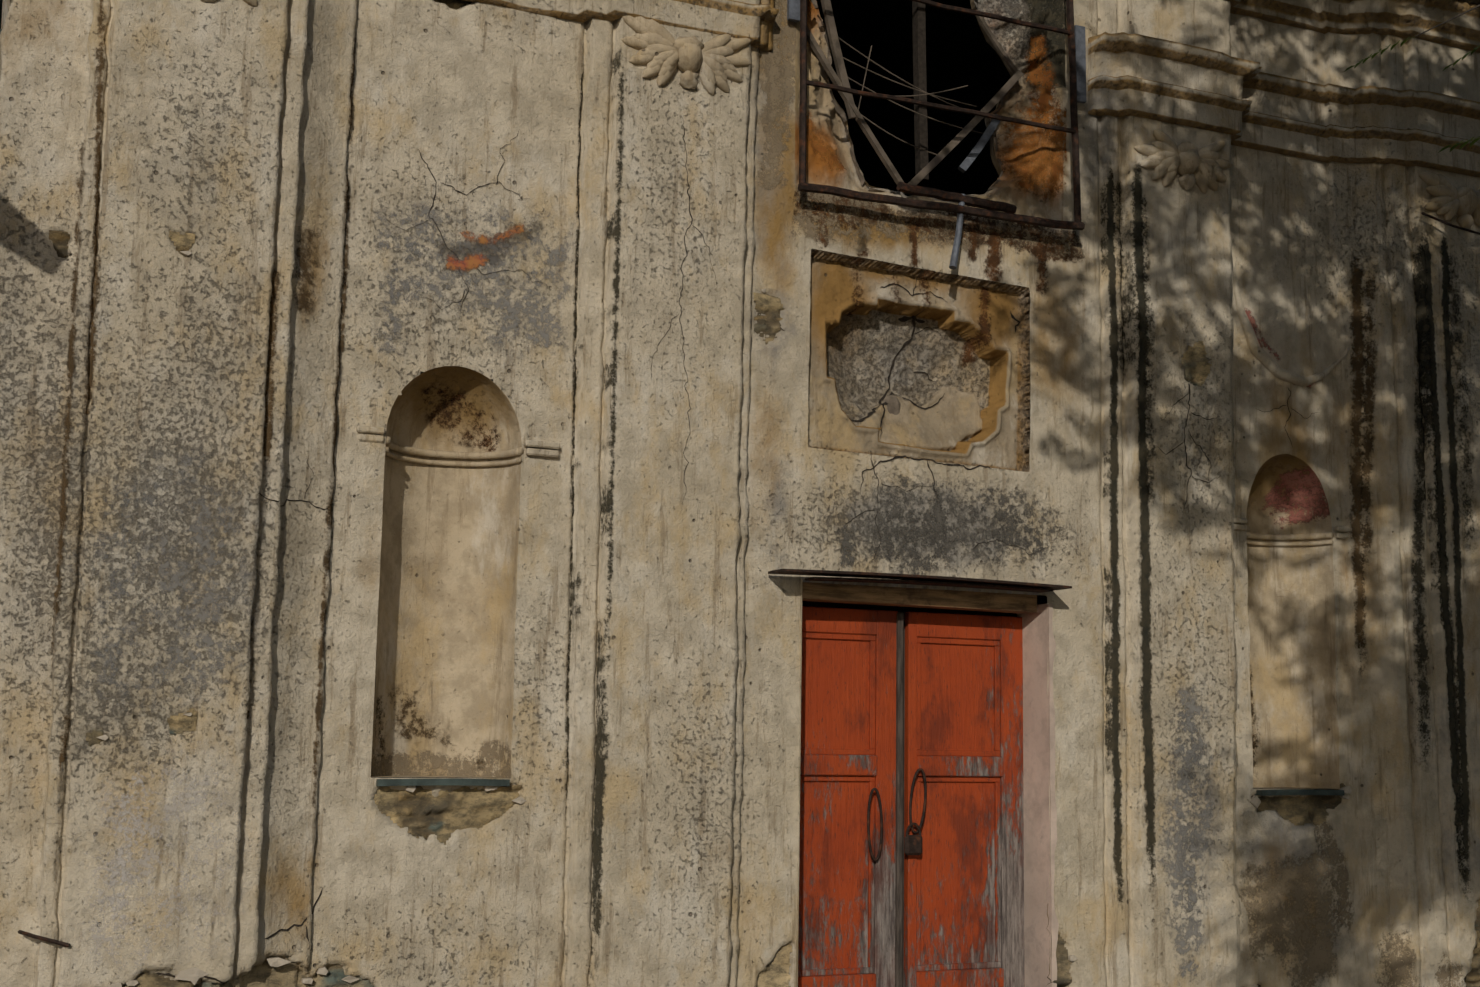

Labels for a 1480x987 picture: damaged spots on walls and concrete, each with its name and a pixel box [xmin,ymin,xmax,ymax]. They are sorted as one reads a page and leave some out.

peeling [757,0,1085,258]
corrosion [997,36,1067,201]
crack [842,267,1047,560]
water stain [837,477,1064,575]
water stain [1100,163,1156,902]
water stain [1349,258,1377,675]
water stain [1408,233,1475,894]
spalling [106,956,374,987]
spalling [756,943,792,987]
peeling [1239,783,1353,987]
peeling [1378,899,1480,987]